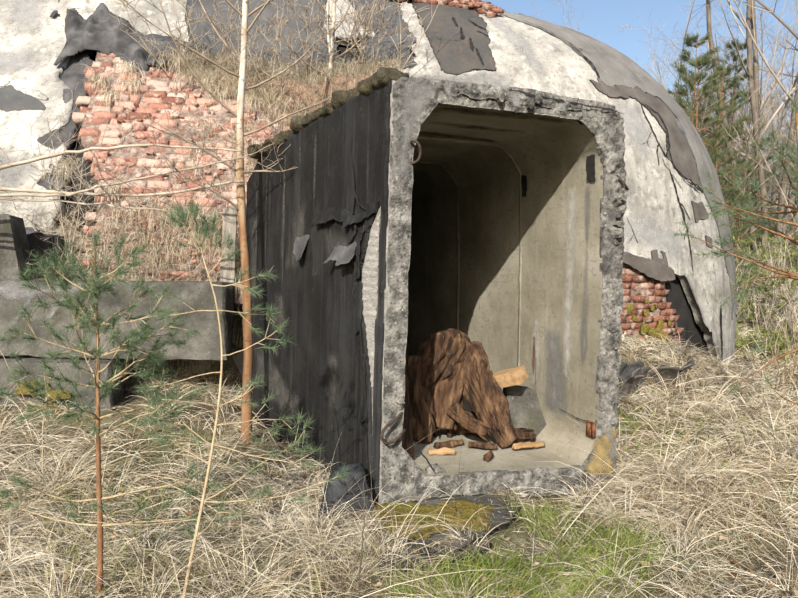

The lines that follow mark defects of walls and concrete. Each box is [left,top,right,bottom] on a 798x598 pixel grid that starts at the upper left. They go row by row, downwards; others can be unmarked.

spalling [0,81,49,111]
crack [507,88,622,114]
crack [640,103,703,275]
peeling [293,234,310,262]
peeling [314,202,380,424]